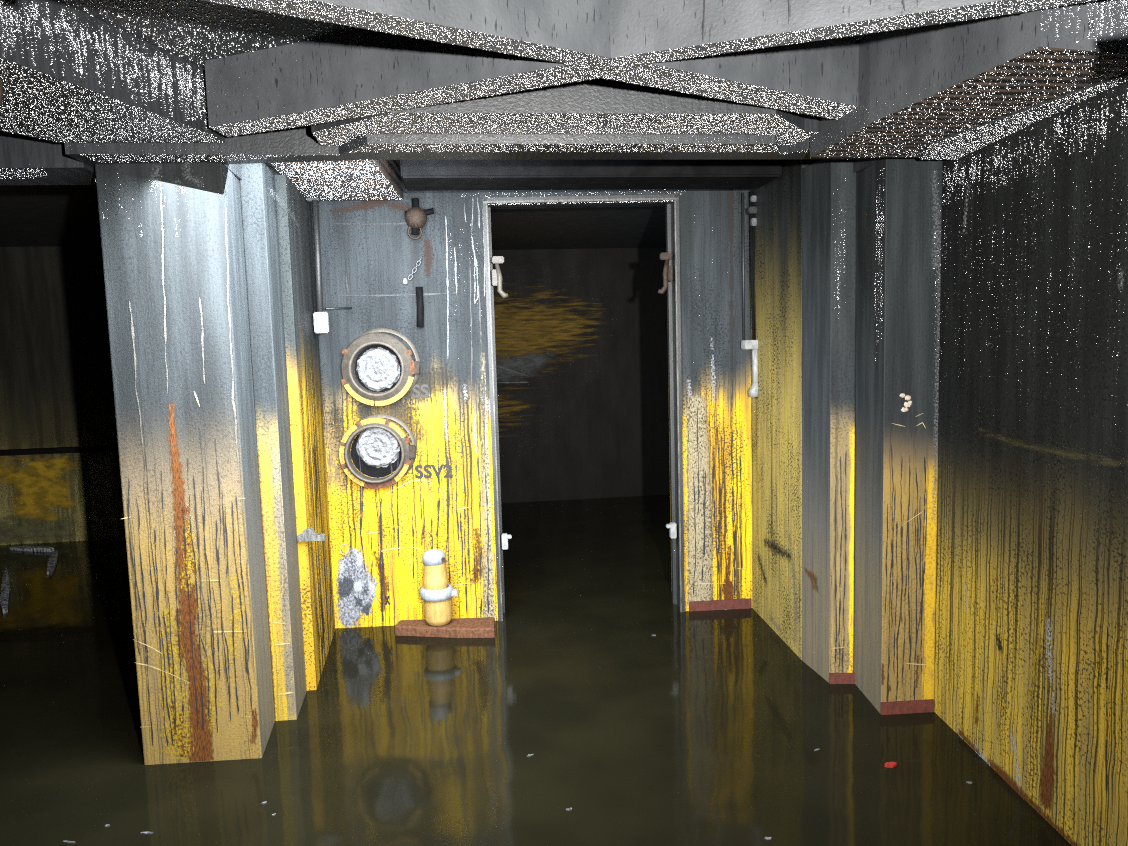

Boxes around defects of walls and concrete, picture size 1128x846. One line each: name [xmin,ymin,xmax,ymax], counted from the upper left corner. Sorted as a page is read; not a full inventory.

corrosion [167,404,214,762]
flaking render [319,548,378,653]
corrosion [250,709,258,744]